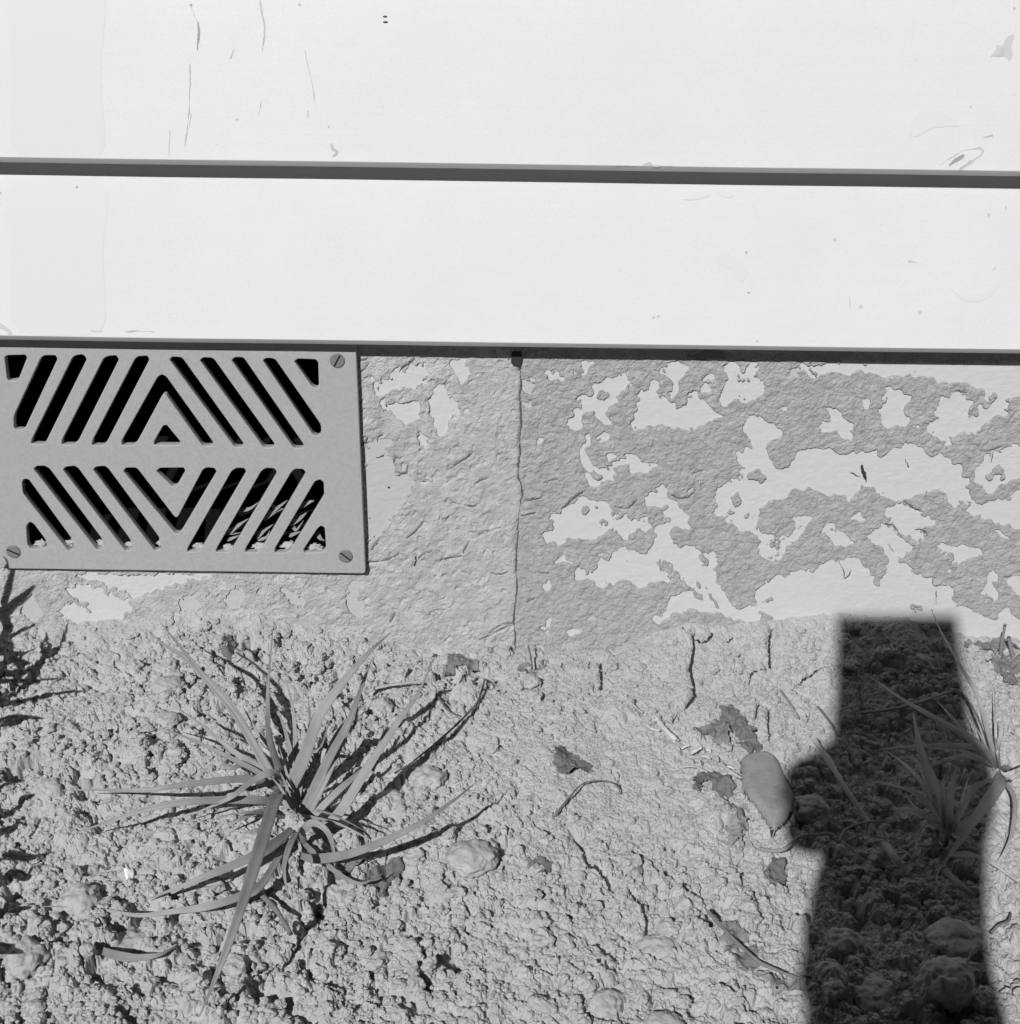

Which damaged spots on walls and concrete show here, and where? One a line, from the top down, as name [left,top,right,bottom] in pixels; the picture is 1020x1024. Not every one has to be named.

spalling [366,357,469,446]
spalling [449,348,473,384]
spalling [361,438,425,544]
crack [364,368,585,650]
spalling [511,351,1020,639]
spalling [21,594,43,622]
spalling [59,570,210,624]
spalling [345,580,364,617]